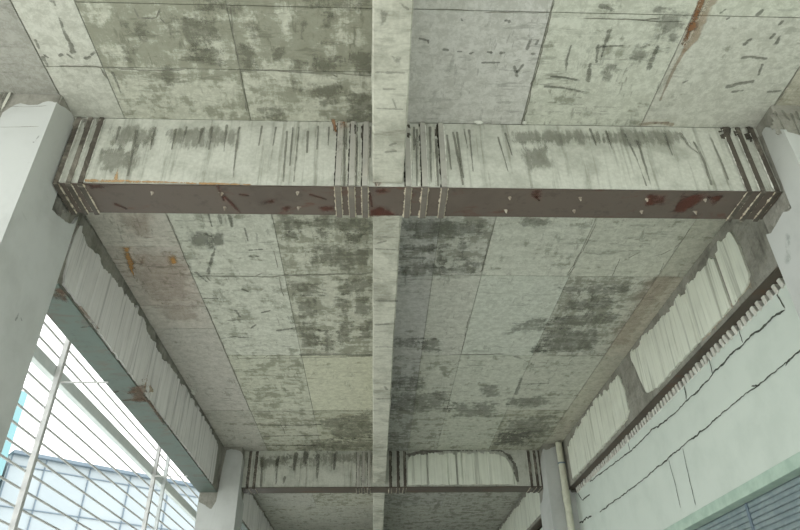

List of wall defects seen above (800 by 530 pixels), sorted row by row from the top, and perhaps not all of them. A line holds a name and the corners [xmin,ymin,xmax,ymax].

corrosion [681,0,705,45]
water stain [127,130,138,176]
corrosion [675,195,723,213]
flaking render [57,217,206,418]
spalling [570,222,772,437]
corrosion [113,384,164,425]
crack [578,294,800,524]
flaking render [491,450,519,482]